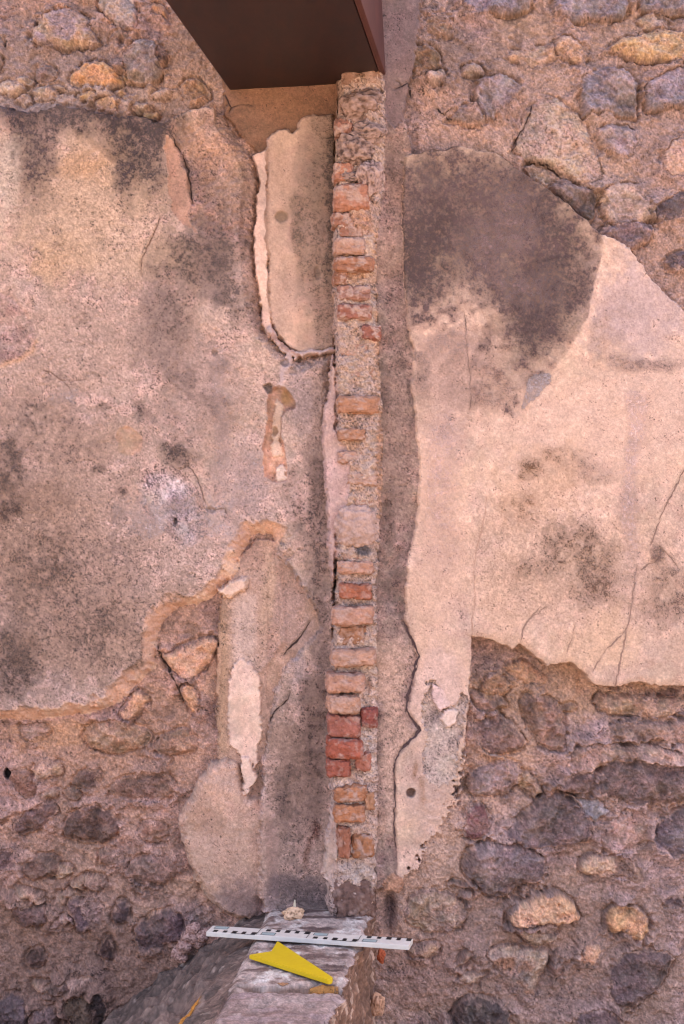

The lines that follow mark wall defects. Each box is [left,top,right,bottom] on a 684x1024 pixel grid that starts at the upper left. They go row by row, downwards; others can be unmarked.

damp [0,104,185,196]
damp [387,146,601,415]
damp [610,358,672,371]
flaking render [262,386,297,484]
flaking render [218,576,250,599]
crack [593,470,684,686]
flaking render [227,658,263,796]
crack [393,623,421,846]